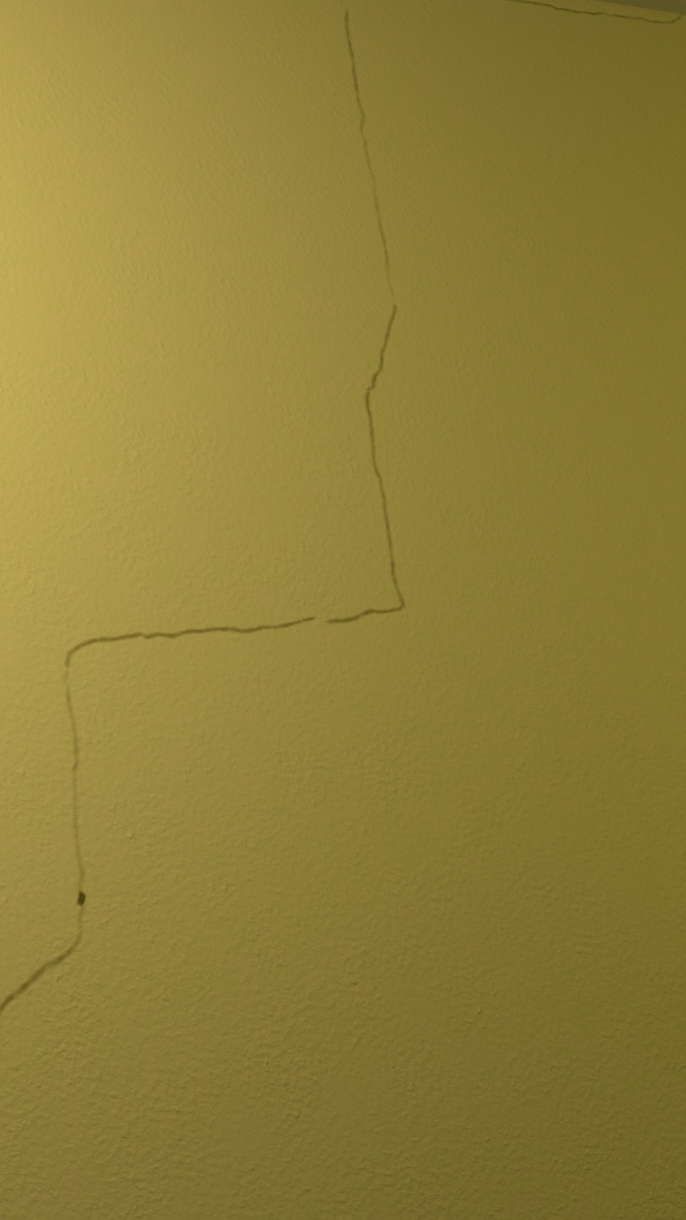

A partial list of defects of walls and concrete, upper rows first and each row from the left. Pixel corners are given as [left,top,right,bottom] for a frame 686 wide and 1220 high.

crack [74,562,403,650]
crack [0,951,69,1009]